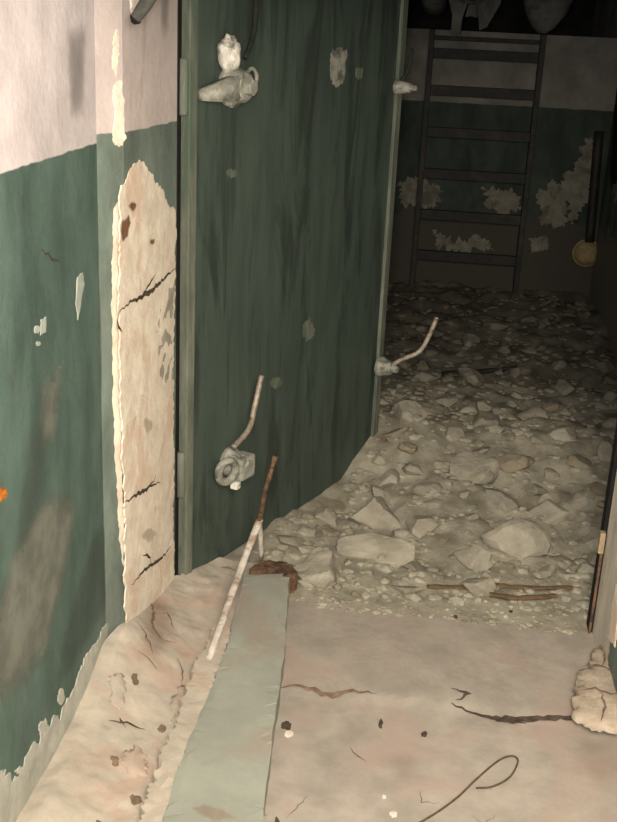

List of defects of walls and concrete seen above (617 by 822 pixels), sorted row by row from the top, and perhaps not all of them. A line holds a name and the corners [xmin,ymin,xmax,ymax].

flaking render [112,29,126,147]
peeling [397,176,442,209]
peeling [481,185,522,214]
peeling [535,131,594,229]
peeling [431,229,494,253]
crack [117,268,175,331]
peeling [111,160,177,623]
crack [125,475,160,502]
crack [131,546,171,585]
flaking render [571,583,617,734]
crack [281,684,377,699]
crack [451,688,573,724]